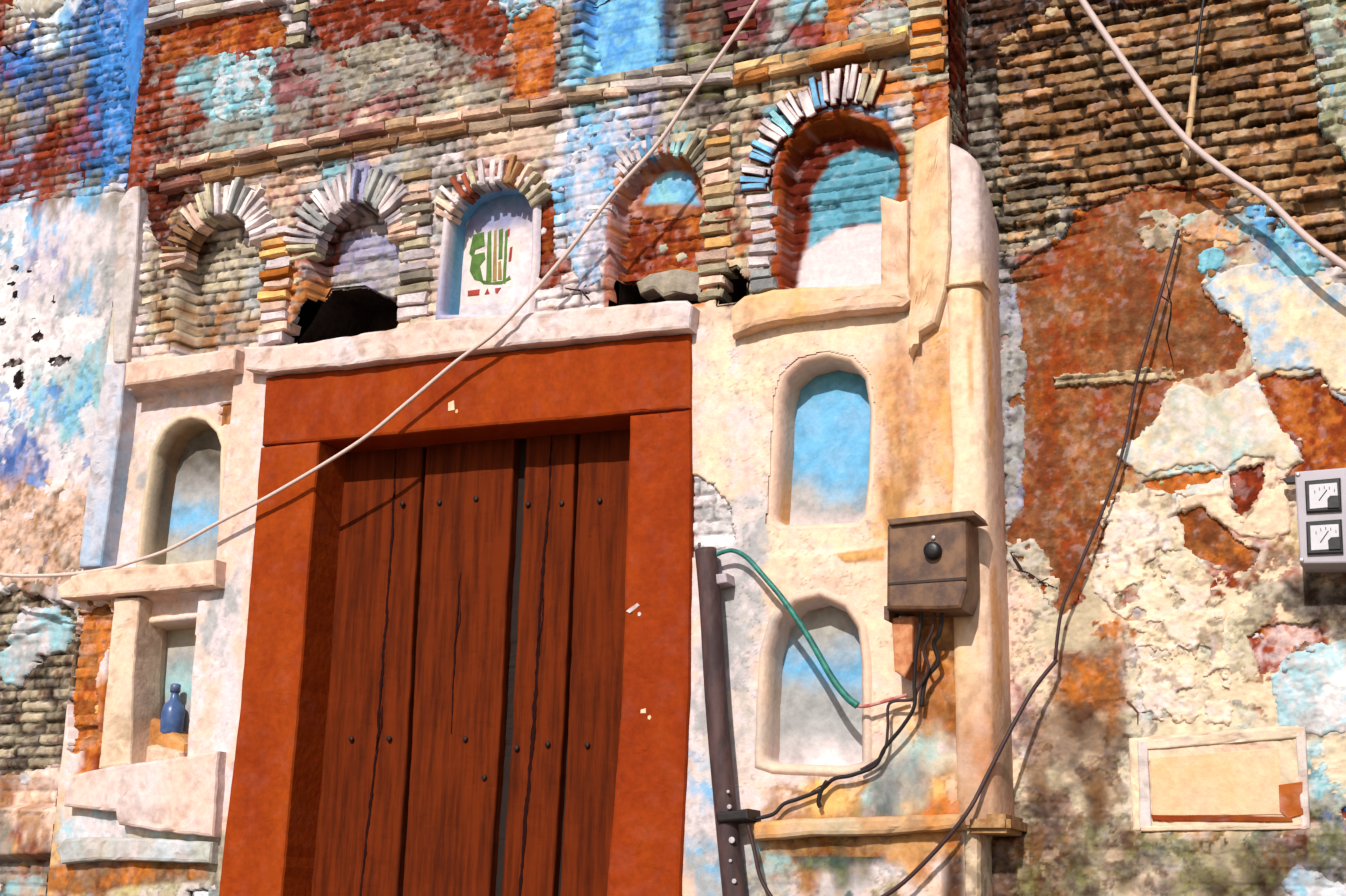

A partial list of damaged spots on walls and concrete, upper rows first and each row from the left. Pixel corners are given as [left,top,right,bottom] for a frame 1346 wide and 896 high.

spalling [7,265,32,299]
spalling [3,358,25,390]
spalling [47,355,71,367]
spalling [965,0,1346,737]
spalling [693,475,735,559]
spalling [0,478,114,785]
damp [992,704,1156,896]
damp [1165,842,1321,896]
peeling [1282,864,1346,896]